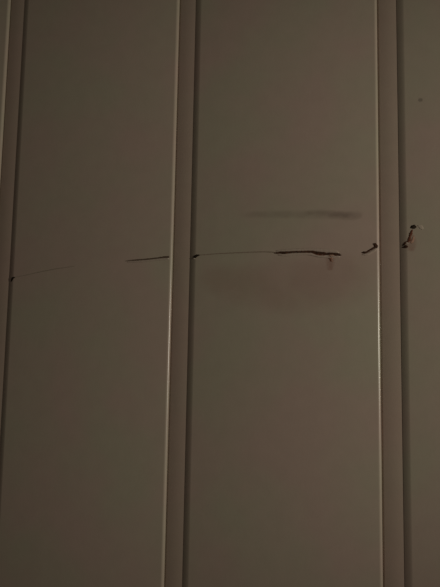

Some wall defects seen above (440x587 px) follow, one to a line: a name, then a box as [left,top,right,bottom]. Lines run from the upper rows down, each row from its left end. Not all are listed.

crack [127,255,169,263]
crack [192,248,341,262]
crack [361,243,378,256]